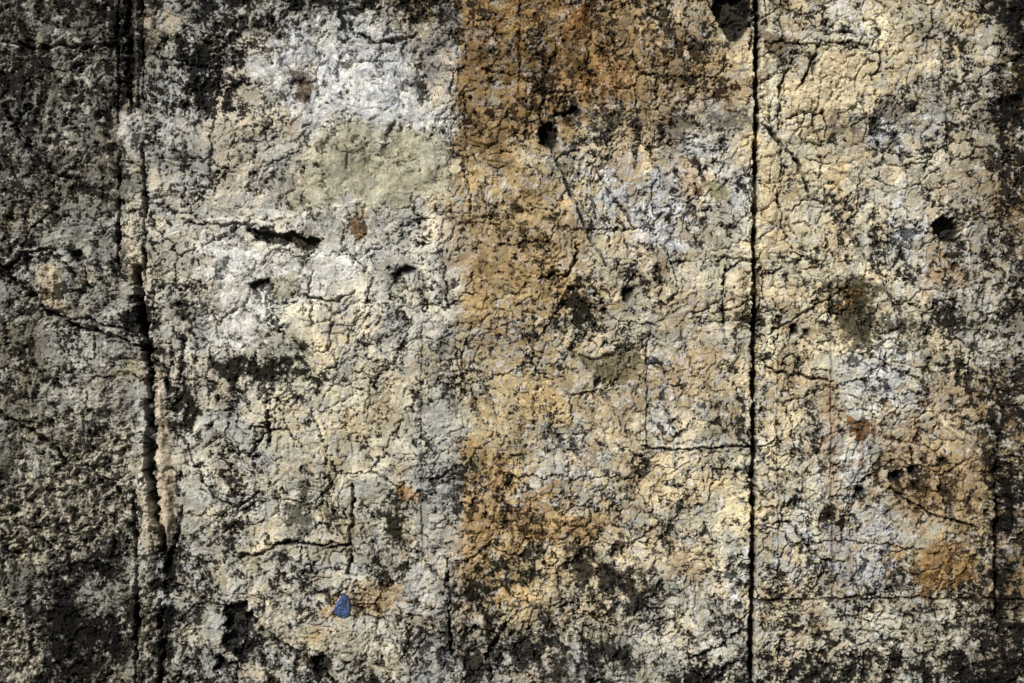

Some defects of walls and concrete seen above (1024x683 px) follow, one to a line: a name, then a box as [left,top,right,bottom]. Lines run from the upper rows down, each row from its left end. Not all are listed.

corrosion [345,208,370,248]
crack [640,285,1024,639]
corrosion [812,368,997,615]